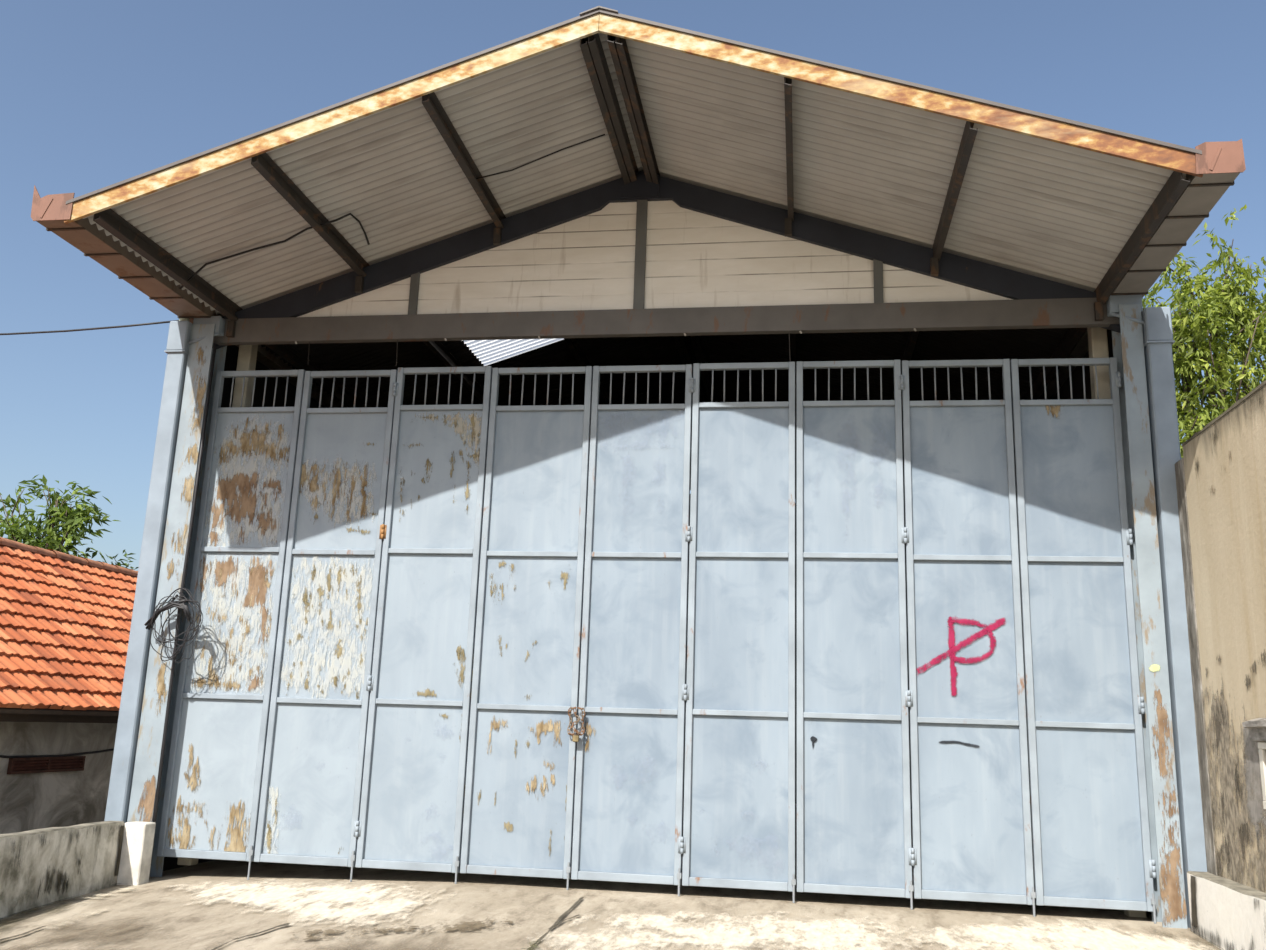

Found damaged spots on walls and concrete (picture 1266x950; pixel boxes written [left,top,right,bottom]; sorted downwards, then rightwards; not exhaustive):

peeling [190,415,378,698]
peeling [265,788,278,854]
rust [1152,689,1187,928]
crack [527,897,583,950]
damp [1190,926,1231,950]